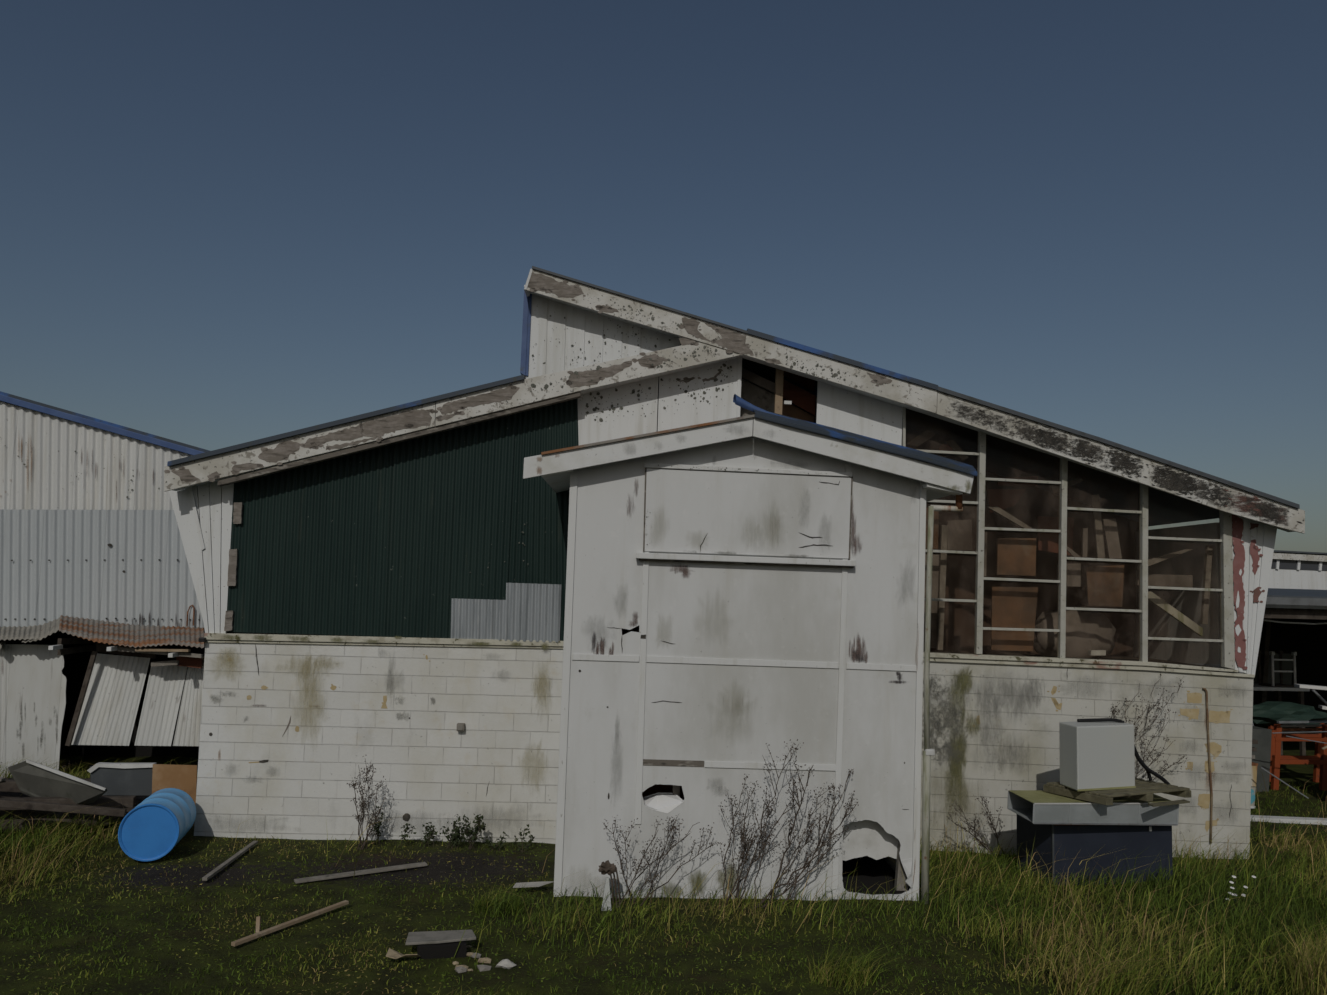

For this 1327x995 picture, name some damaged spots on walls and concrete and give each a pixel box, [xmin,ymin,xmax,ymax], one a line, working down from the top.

peeling [595,305,619,313]
peeling [679,317,782,364]
peeling [566,351,668,388]
peeling [867,372,892,386]
peeling [1197,485,1279,670]
spalling [1178,690,1233,724]
leakage [948,671,979,803]